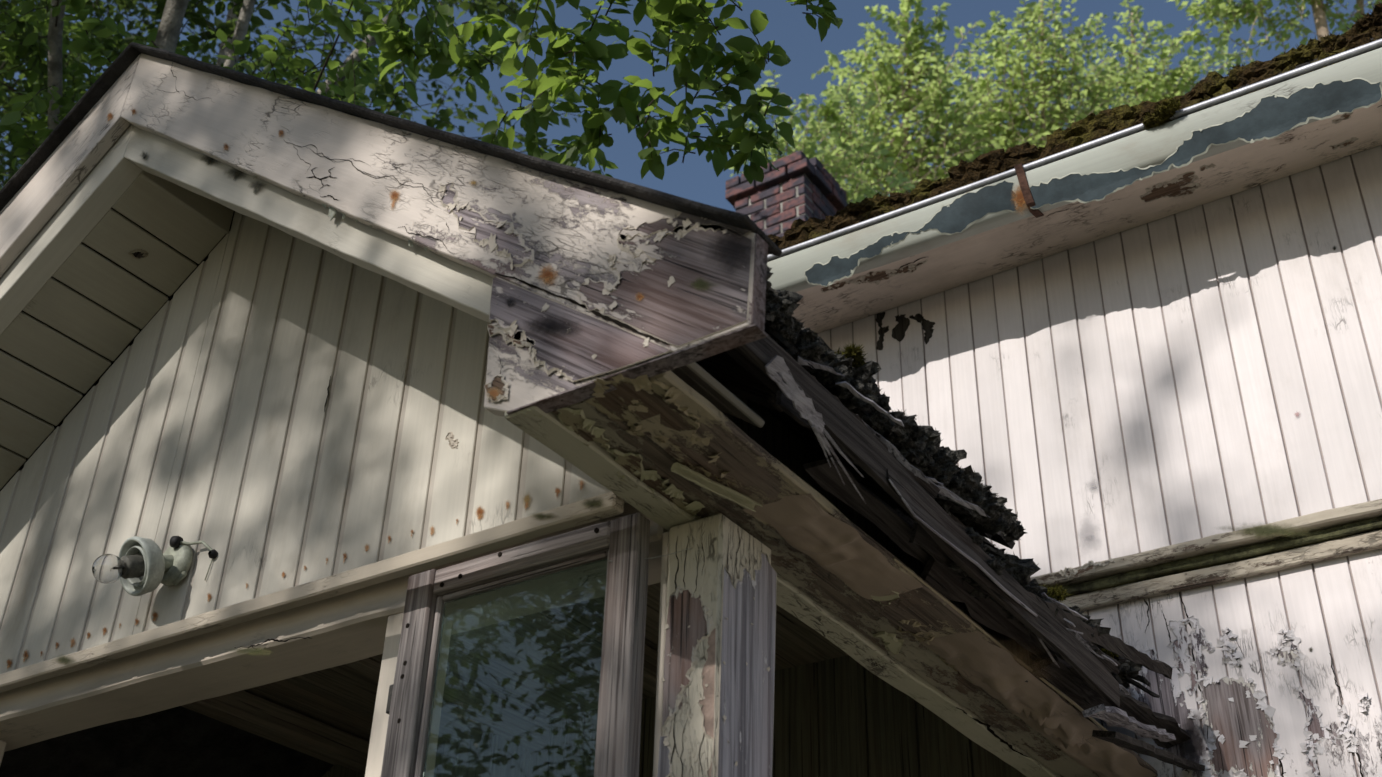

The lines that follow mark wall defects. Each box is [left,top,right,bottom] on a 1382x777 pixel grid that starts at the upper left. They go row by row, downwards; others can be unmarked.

peeling [805,77,1382,293]
crack [494,273,678,347]
peeling [438,182,763,518]
rust [7,612,157,668]
peeling [657,552,777,777]
peeling [1130,615,1284,777]
peeling [1269,629,1371,777]